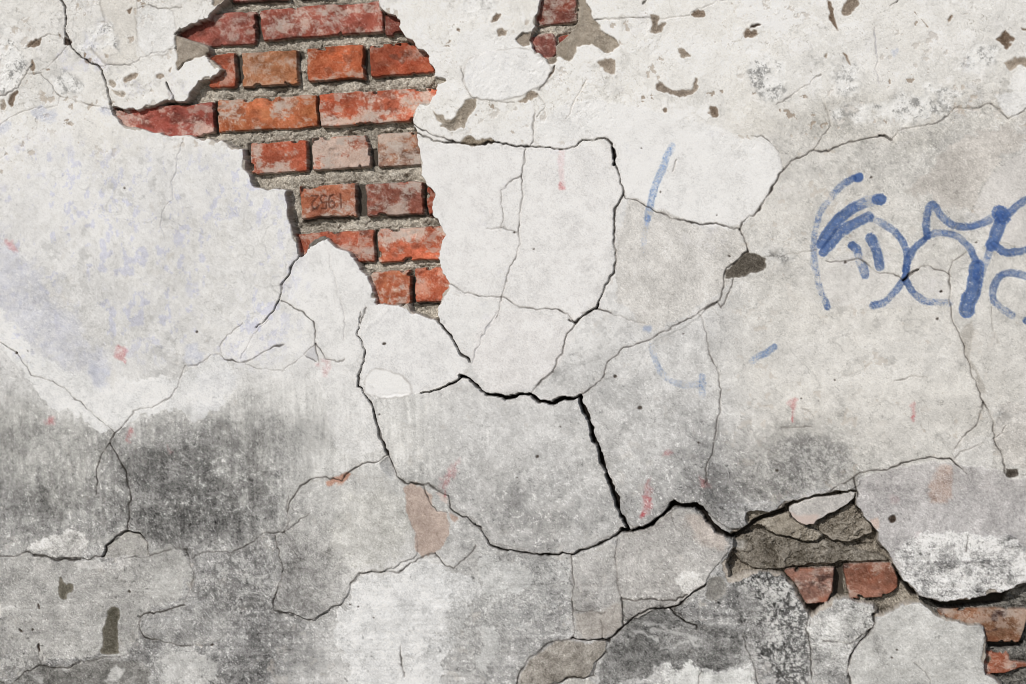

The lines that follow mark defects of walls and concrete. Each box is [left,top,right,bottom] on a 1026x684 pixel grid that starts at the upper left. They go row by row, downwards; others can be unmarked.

crack [0,0,174,126]
crack [461,68,515,104]
spalling [491,0,619,78]
peeling [828,0,860,31]
spalling [109,0,495,320]
peeling [725,253,767,279]
crack [0,255,346,560]
crack [103,103,1026,684]
leakage [0,391,331,560]
crack [0,551,87,562]
leakage [239,613,329,684]
spalling [706,490,1026,684]